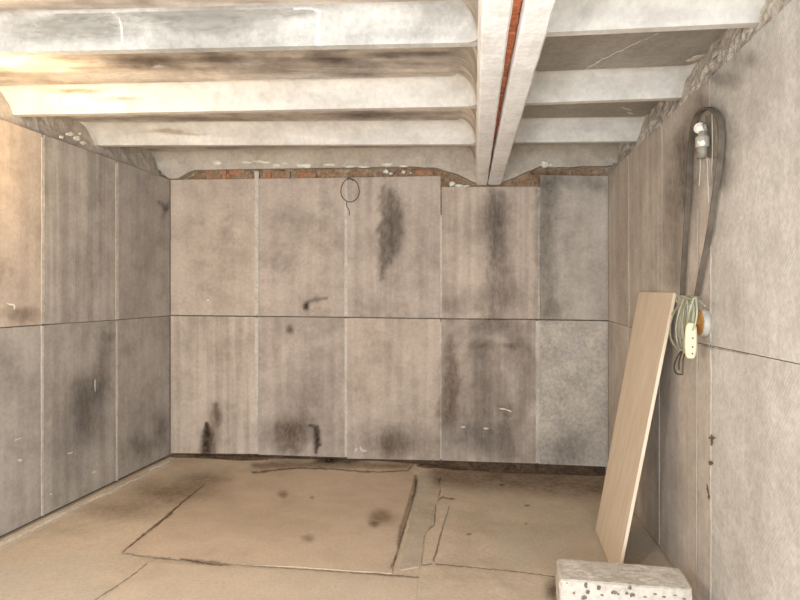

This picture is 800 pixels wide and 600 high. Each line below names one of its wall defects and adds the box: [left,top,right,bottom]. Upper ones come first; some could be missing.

crack [585,33,659,70]
spalling [616,0,792,166]
damp [202,405,217,456]
damp [282,424,356,466]